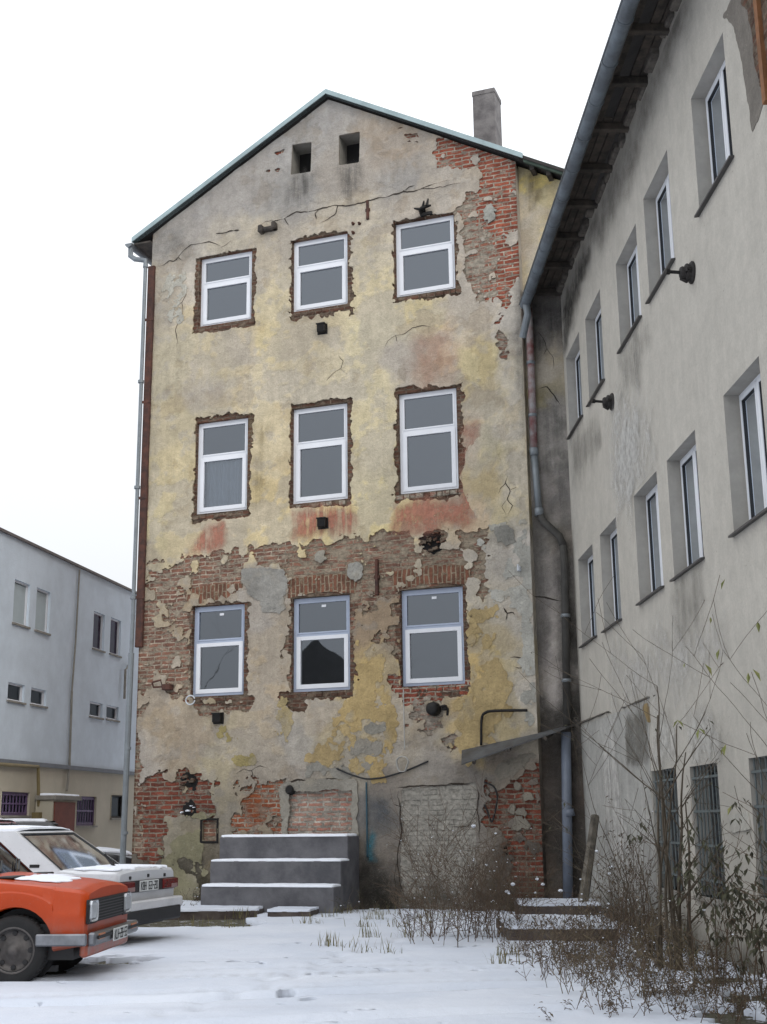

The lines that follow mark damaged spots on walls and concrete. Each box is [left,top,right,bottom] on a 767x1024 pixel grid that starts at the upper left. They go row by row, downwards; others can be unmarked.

flaking render [741,0,767,87]
crack [164,181,459,265]
flaking render [432,138,520,360]
flaking render [138,519,536,784]
flaking render [133,735,220,900]
flaking render [231,753,289,834]
flaking render [481,753,544,901]